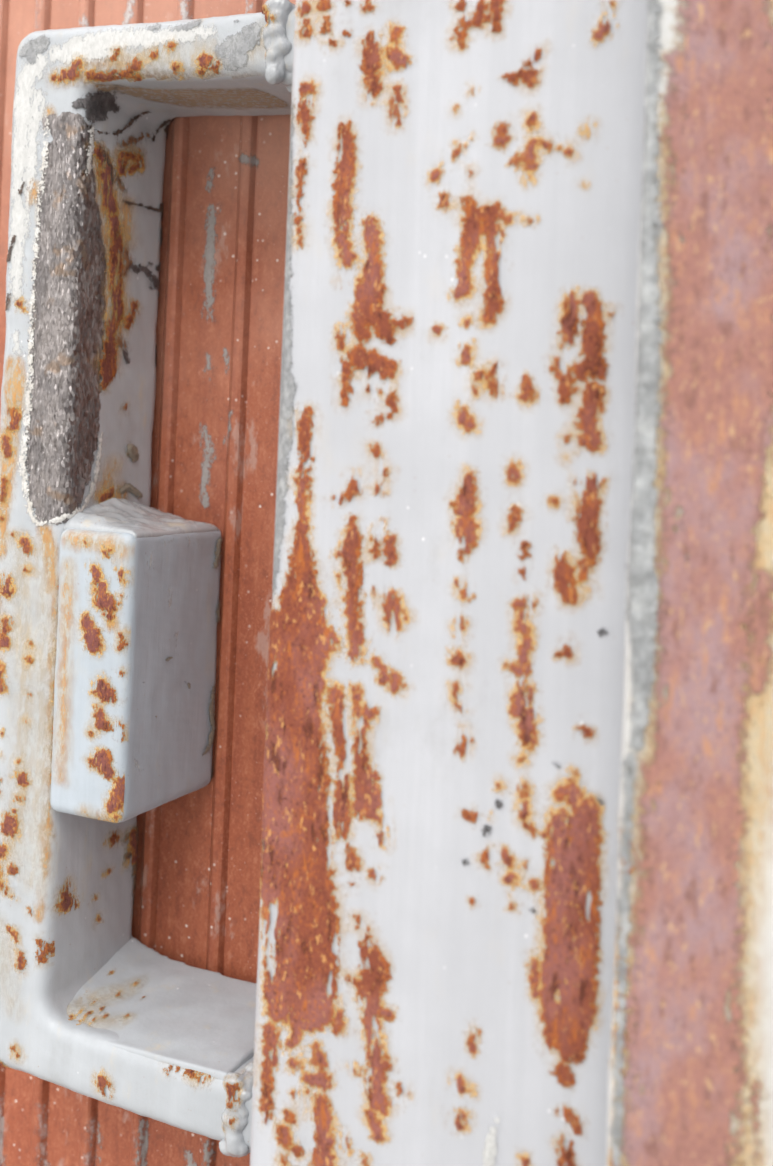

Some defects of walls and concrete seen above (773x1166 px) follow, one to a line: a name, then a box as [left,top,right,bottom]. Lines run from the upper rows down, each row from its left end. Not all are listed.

corrosion [92,133,150,390]
peeling [5,19,261,526]
corrosion [50,41,317,249]
corrosion [294,0,412,128]
corrosion [330,119,414,426]
corrosion [449,0,505,51]
corrosion [427,136,540,435]
corrosion [0,359,129,753]
corrosion [477,0,773,1166]
corrosion [259,406,411,1166]
corrosion [222,1082,243,1129]
corrosion [448,1073,479,1132]